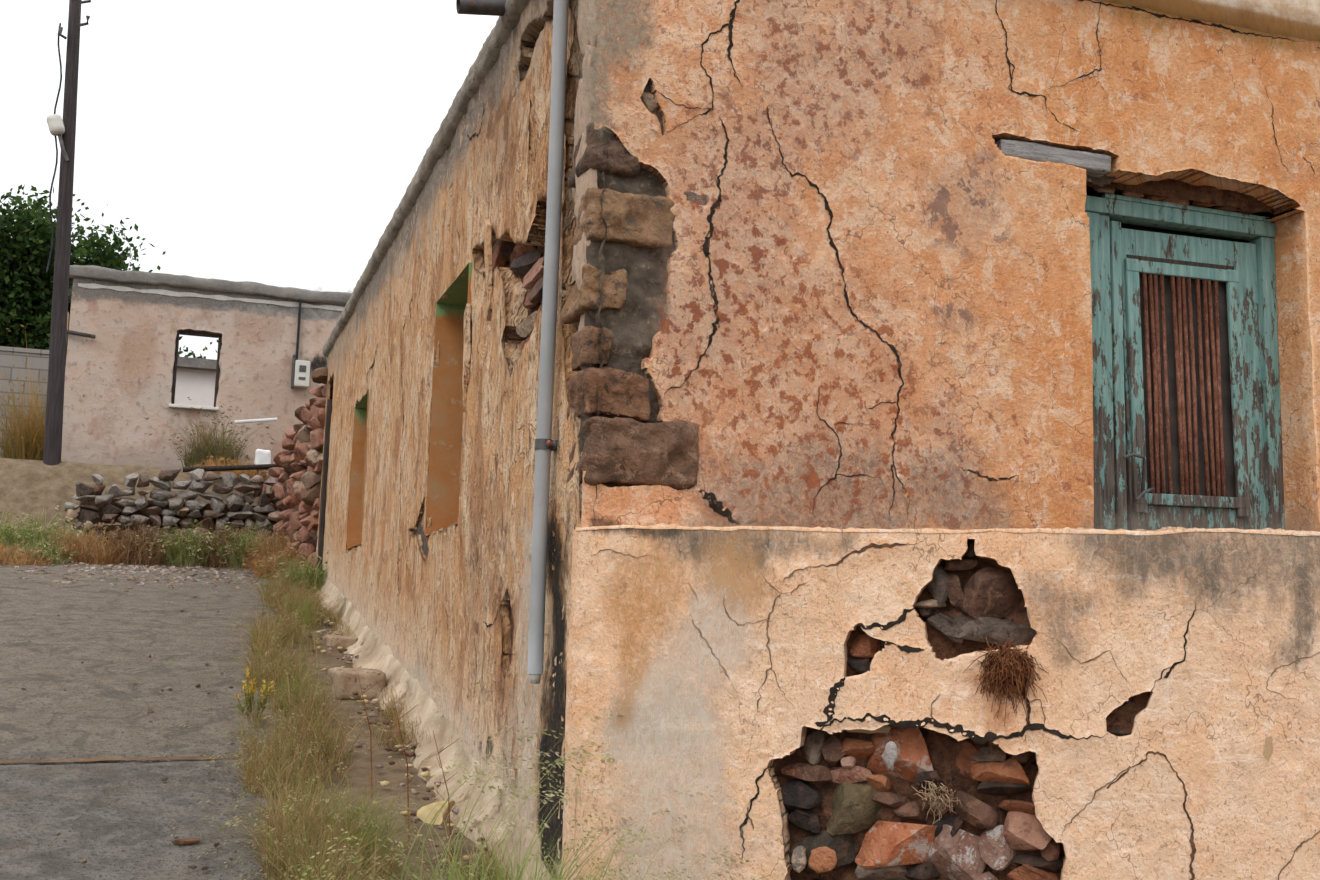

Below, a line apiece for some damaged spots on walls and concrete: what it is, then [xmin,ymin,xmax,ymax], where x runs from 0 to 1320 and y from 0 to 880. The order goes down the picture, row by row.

crack [995,0,1319,133]
spalling [462,219,545,412]
crack [647,0,743,398]
spalling [560,0,980,518]
peeling [929,174,994,238]
crack [681,106,927,718]
spalling [486,576,514,667]
spalling [773,540,1065,880]
crack [815,677,1108,744]
spalling [1106,691,1150,736]
crack [739,760,772,857]
crack [1062,751,1196,880]